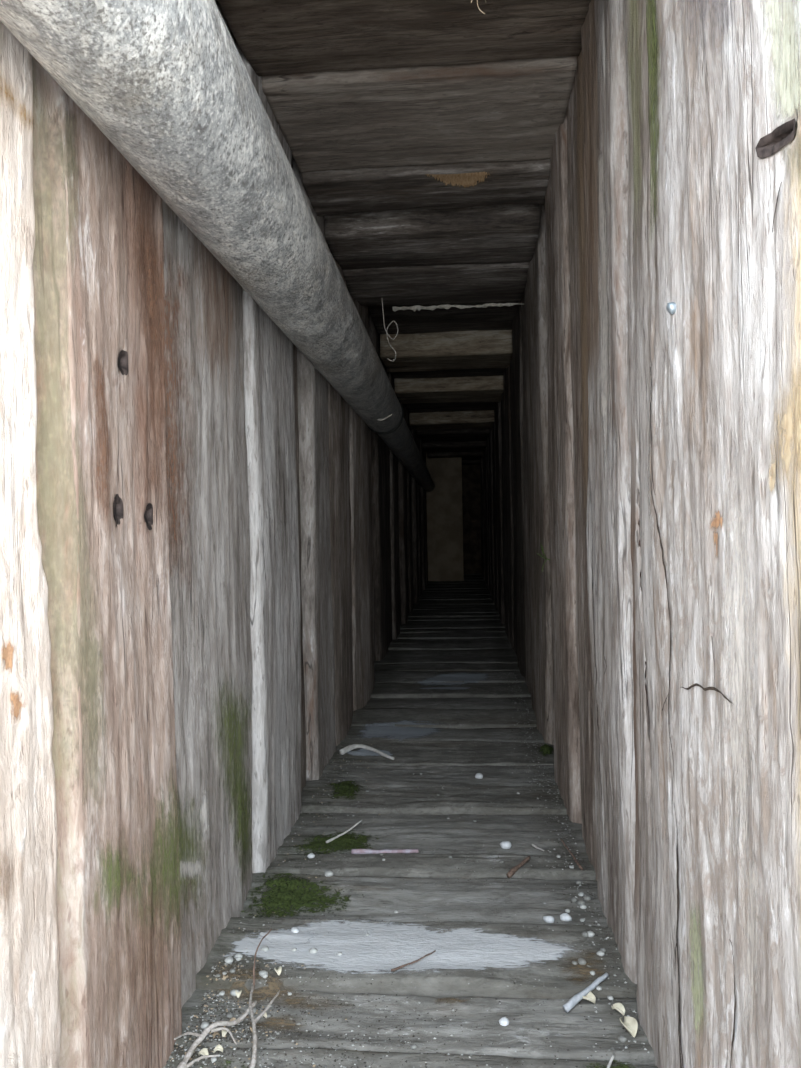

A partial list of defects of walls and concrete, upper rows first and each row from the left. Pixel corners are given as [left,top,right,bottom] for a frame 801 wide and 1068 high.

crack [638,369,732,1068]
crack [728,939,736,1068]